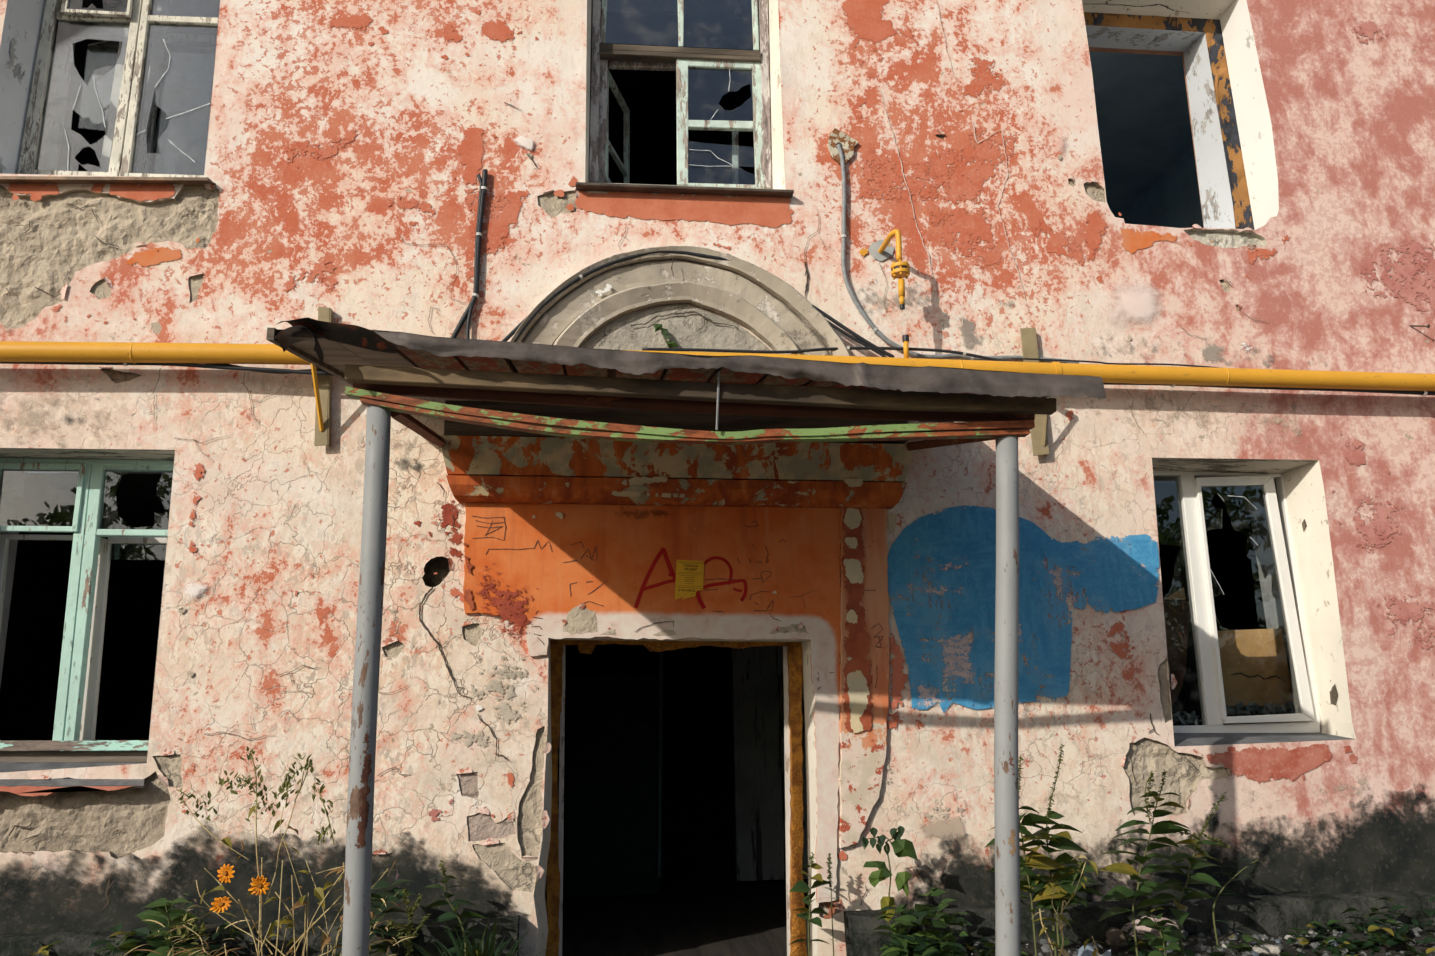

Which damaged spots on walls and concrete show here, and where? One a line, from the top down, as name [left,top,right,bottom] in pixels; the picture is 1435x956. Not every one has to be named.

spalling [0,182,220,329]
spalling [1026,175,1290,311]
peeling [611,476,685,498]
crack [419,587,509,761]
spalling [0,738,196,859]
spalling [428,726,551,892]
leakage [1205,813,1219,832]
spalling [1121,737,1358,816]